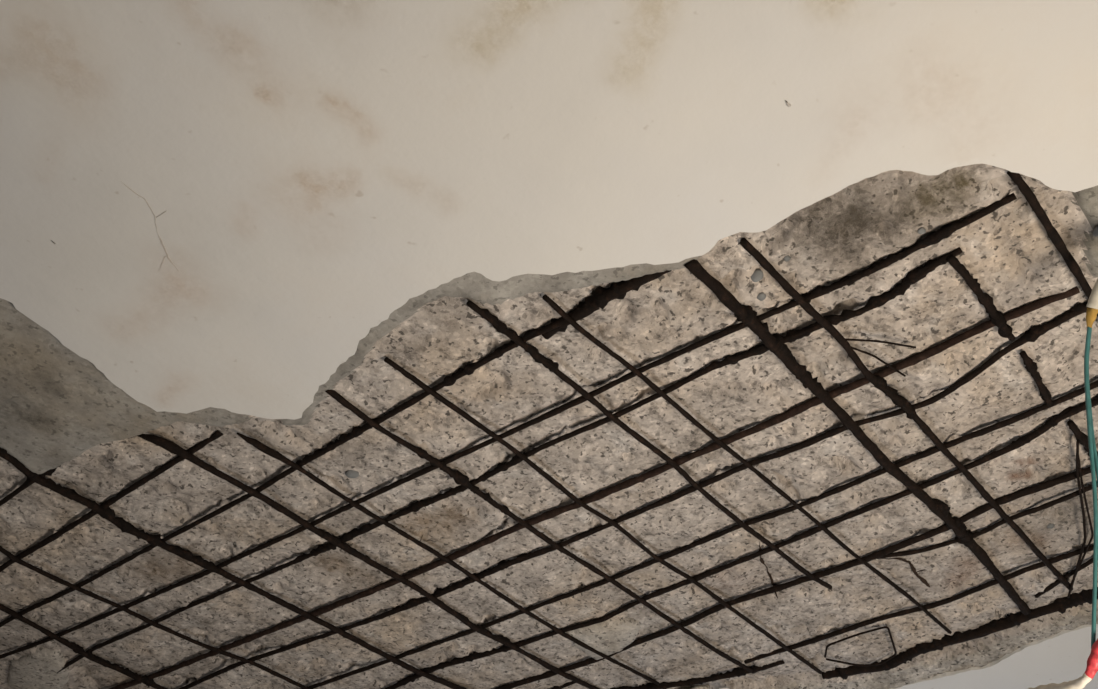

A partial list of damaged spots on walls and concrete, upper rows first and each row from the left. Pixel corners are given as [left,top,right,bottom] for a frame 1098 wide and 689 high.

spalling [0,163,1098,689]